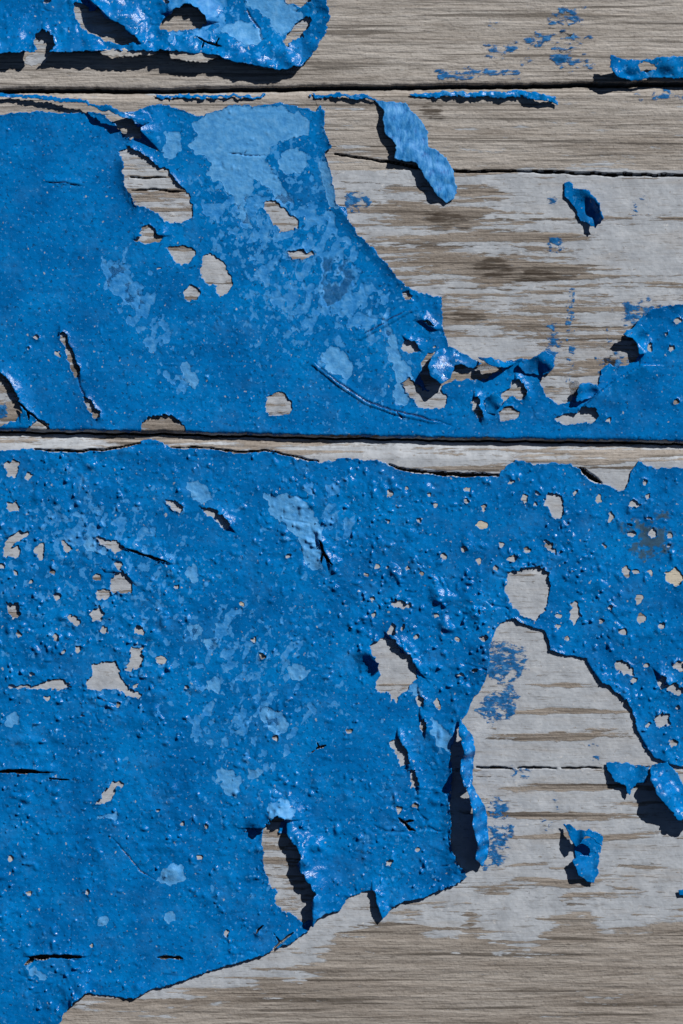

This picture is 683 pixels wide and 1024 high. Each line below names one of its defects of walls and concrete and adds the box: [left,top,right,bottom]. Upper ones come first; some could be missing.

peeling [24,29,55,66]
peeling [74,2,156,57]
peeling [159,0,312,63]
peeling [0,90,683,425]
crack [324,371,435,421]
peeling [59,542,683,1024]